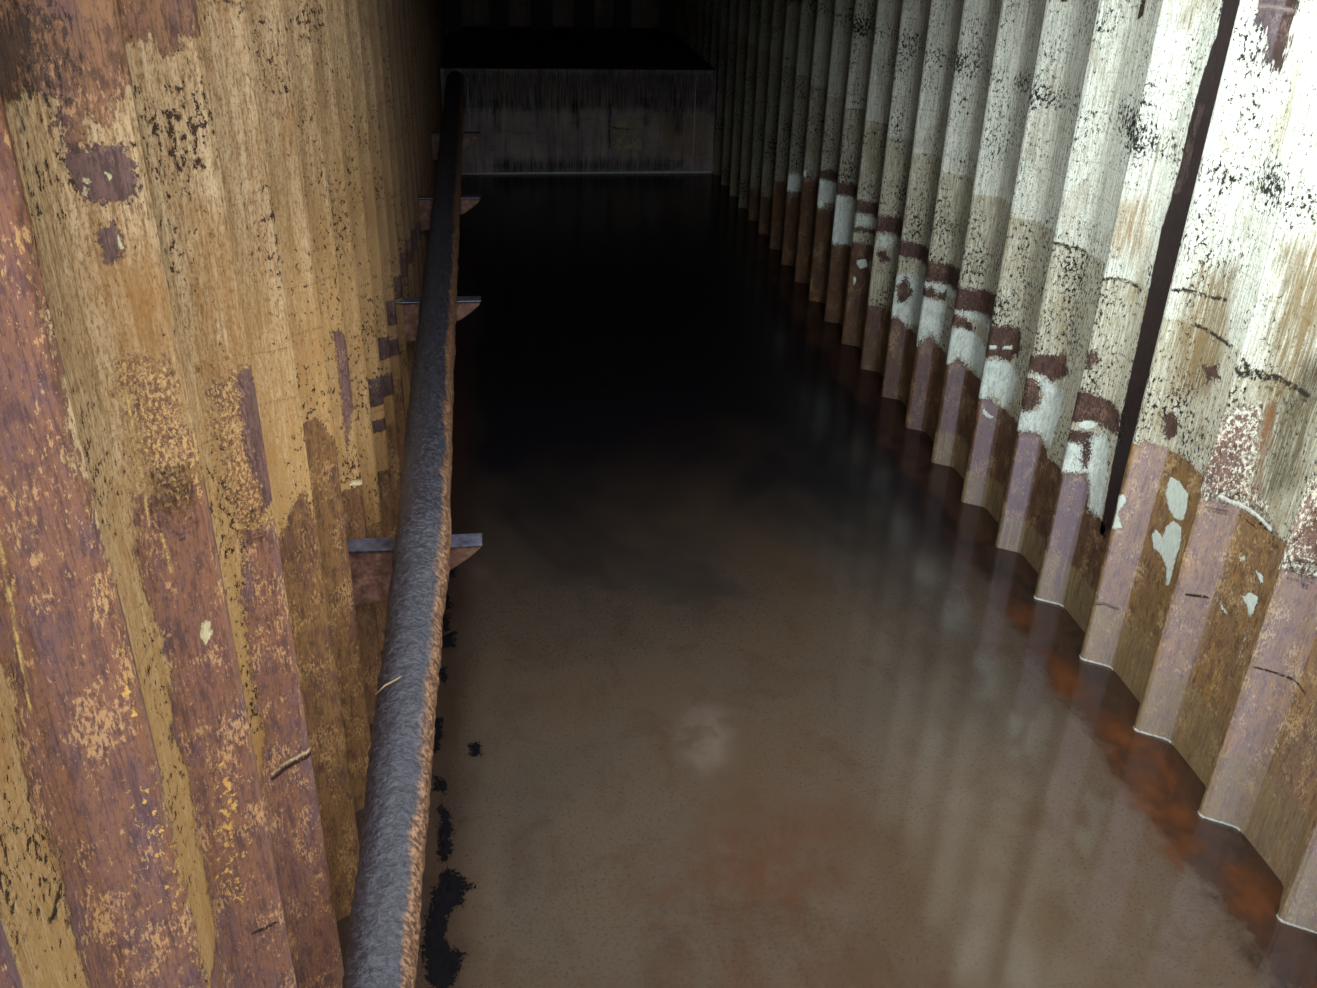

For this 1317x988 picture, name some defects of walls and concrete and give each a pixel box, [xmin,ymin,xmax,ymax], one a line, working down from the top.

corrosion [0,0,247,162]
peeling [748,170,1317,933]